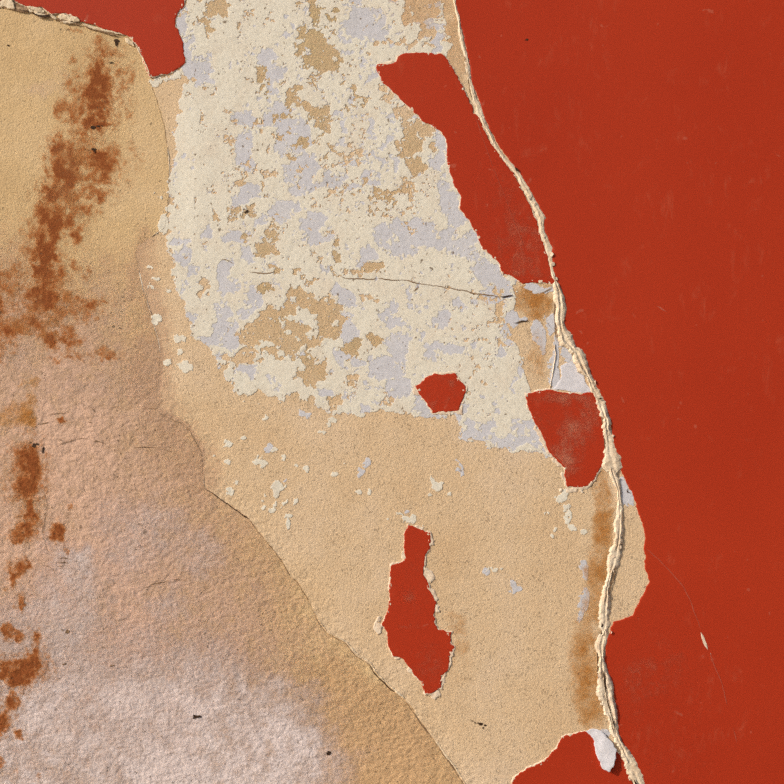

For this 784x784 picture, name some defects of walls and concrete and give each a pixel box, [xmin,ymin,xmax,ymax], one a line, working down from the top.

corrosion [0,35,135,364]
crack [335,272,512,298]
corrosion [4,401,36,427]
crack [0,0,465,783]
peeling [0,0,621,784]
corrosion [7,556,32,587]
corrosion [9,444,47,545]
corrosion [49,523,69,554]
peeling [608,470,650,634]
corrosion [0,622,48,740]